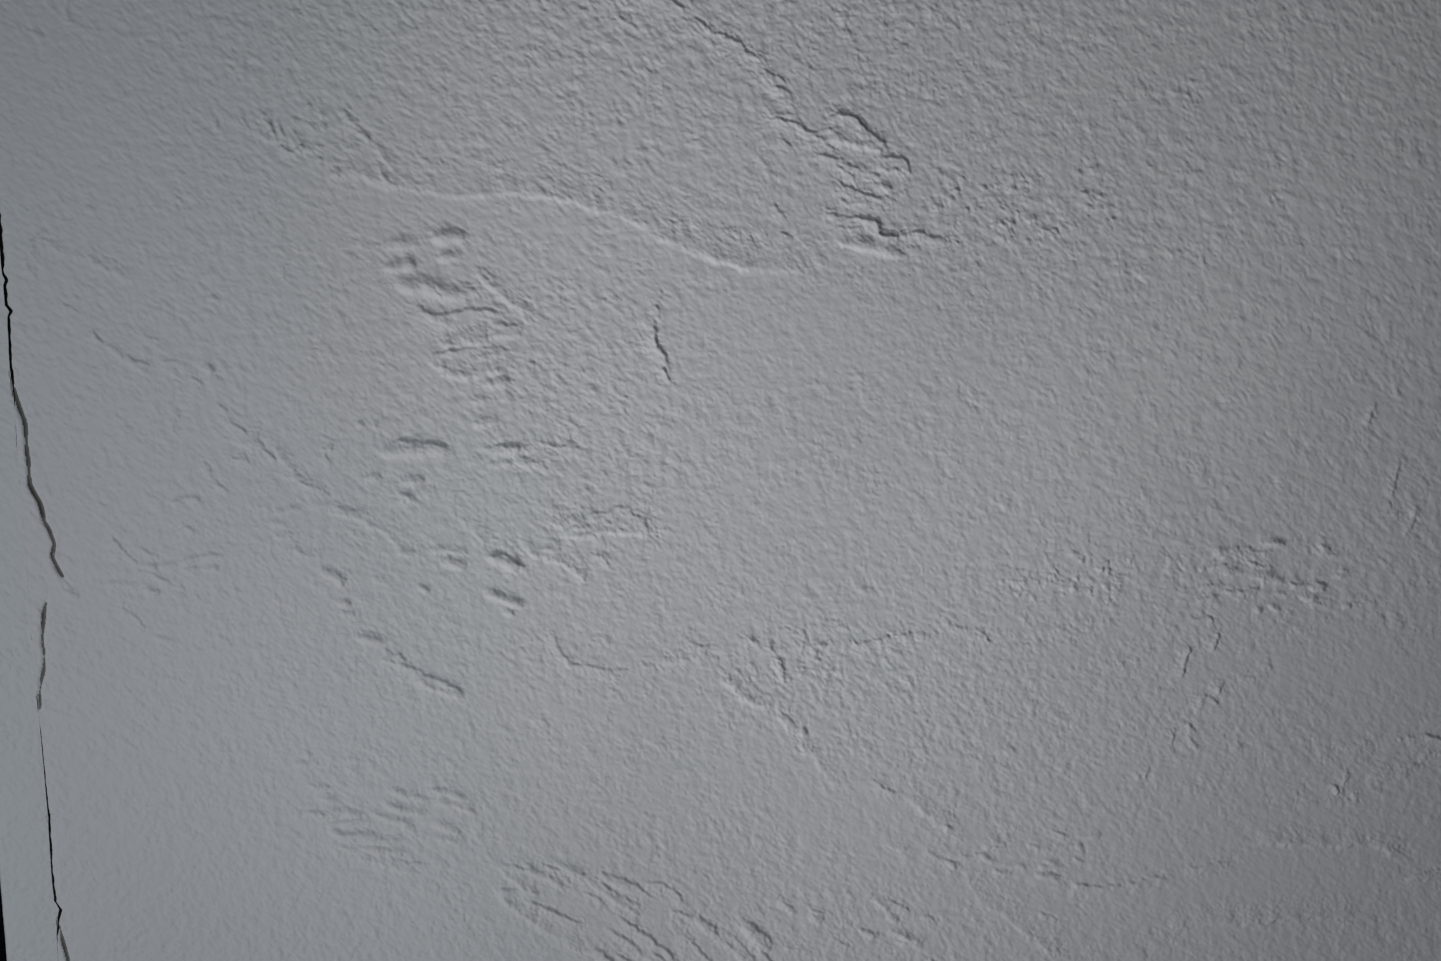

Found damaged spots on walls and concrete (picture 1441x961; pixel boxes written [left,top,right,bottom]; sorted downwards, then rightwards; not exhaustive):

crack [603,0,801,112]
crack [0,213,78,961]